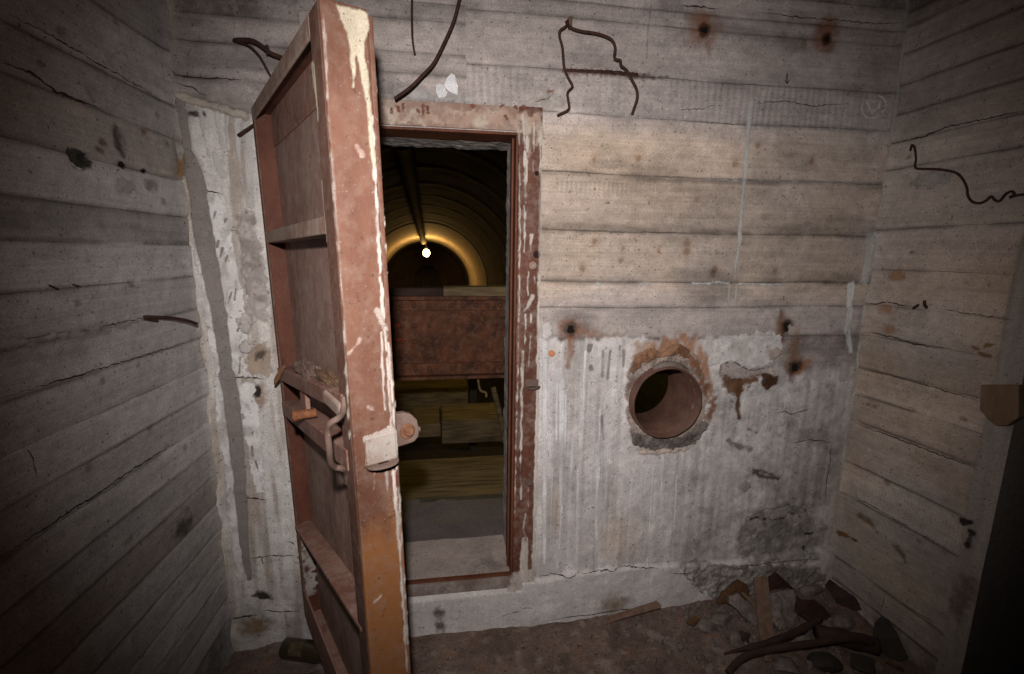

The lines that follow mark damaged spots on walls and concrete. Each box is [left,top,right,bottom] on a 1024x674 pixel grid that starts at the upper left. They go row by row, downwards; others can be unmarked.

crack [8,14,152,94]
corrosion [698,16,709,38]
crack [4,63,102,110]
crack [897,111,1020,143]
corrosion [564,322,576,335]
corrosion [778,312,807,373]
crack [4,343,183,398]
spalling [625,330,783,455]
crack [0,439,181,558]
crack [541,565,704,594]